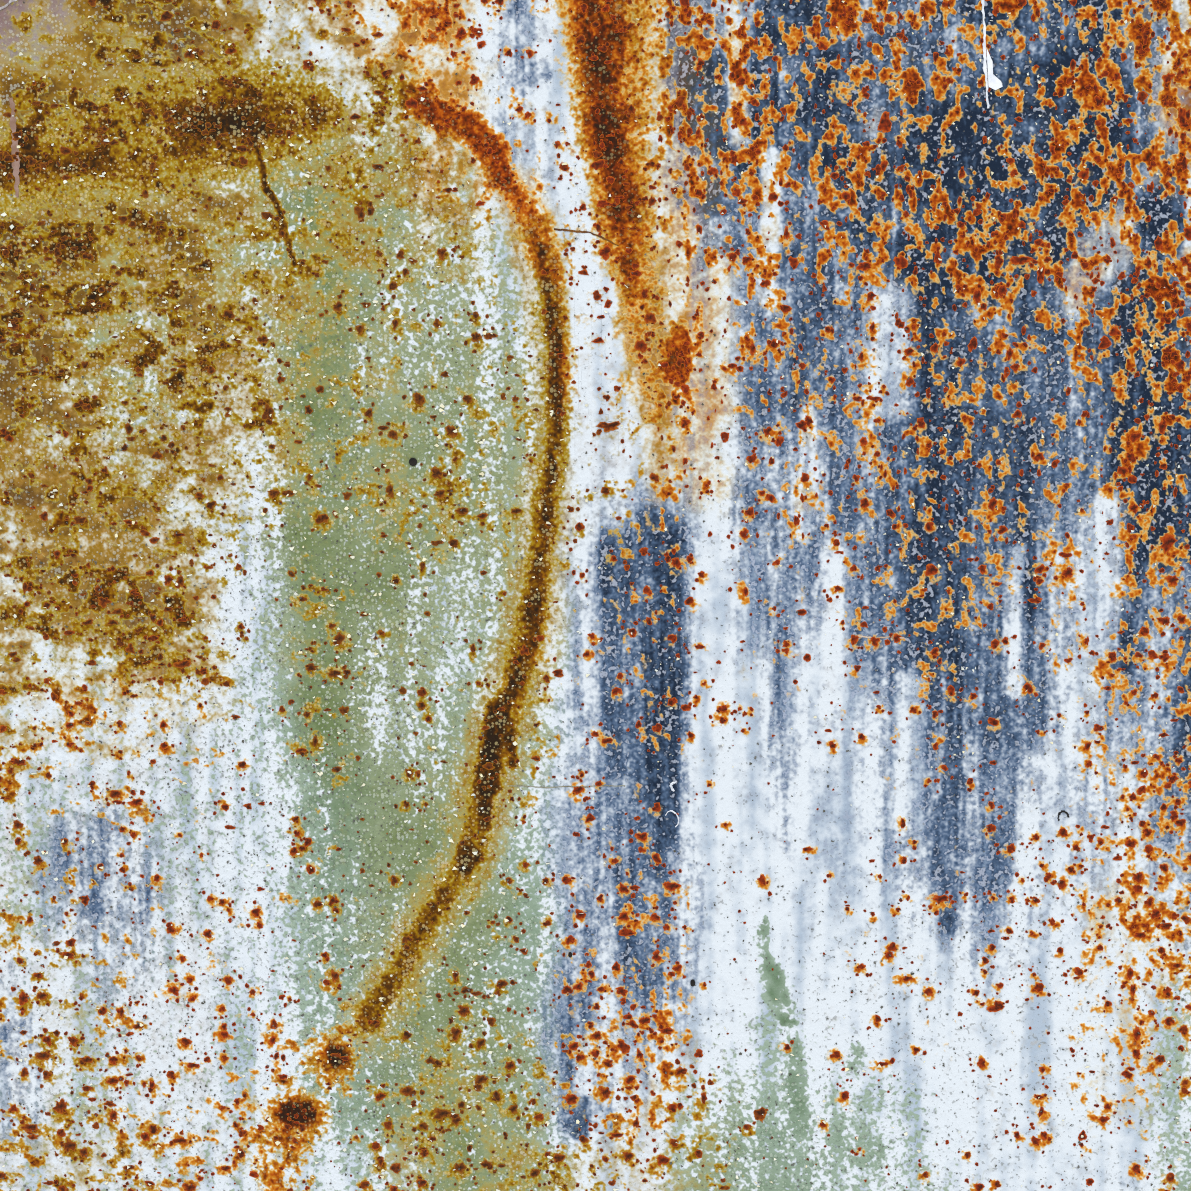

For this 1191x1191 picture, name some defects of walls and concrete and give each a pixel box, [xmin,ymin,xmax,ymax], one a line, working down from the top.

rust [405,97,418,109]
rust [0,151,22,162]
rust [22,155,53,175]